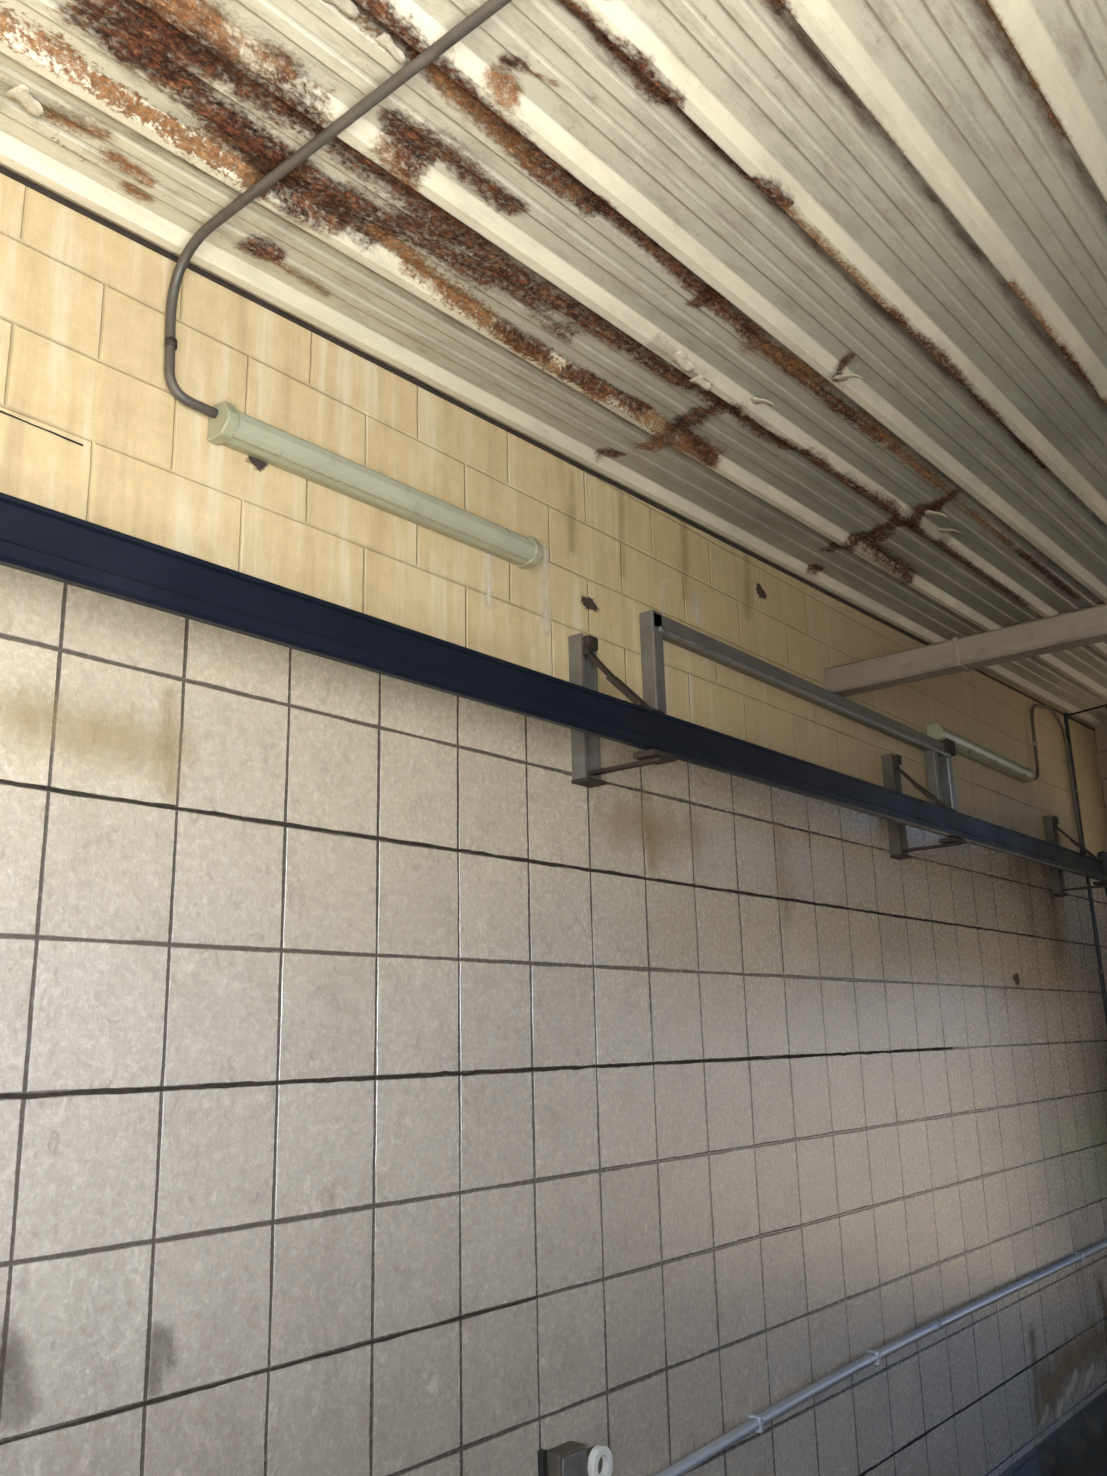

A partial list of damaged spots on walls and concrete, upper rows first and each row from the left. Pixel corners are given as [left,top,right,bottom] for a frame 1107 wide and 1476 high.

rust [0,0,1107,640]